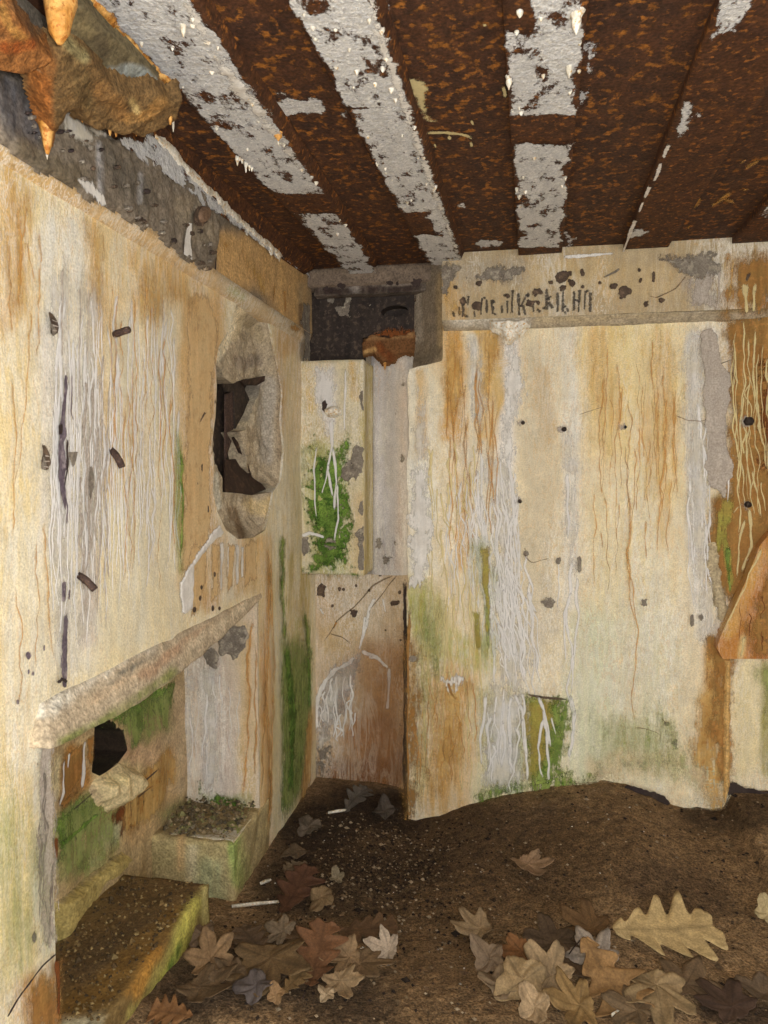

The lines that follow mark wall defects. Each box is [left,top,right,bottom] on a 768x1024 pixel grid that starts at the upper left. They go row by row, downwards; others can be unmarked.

spalling [181,292,282,616]
damp [302,367,347,540]
damp [316,599,391,777]
crack [326,577,396,642]
rust [444,335,499,549]
damp [406,341,556,793]
rust [693,251,768,808]